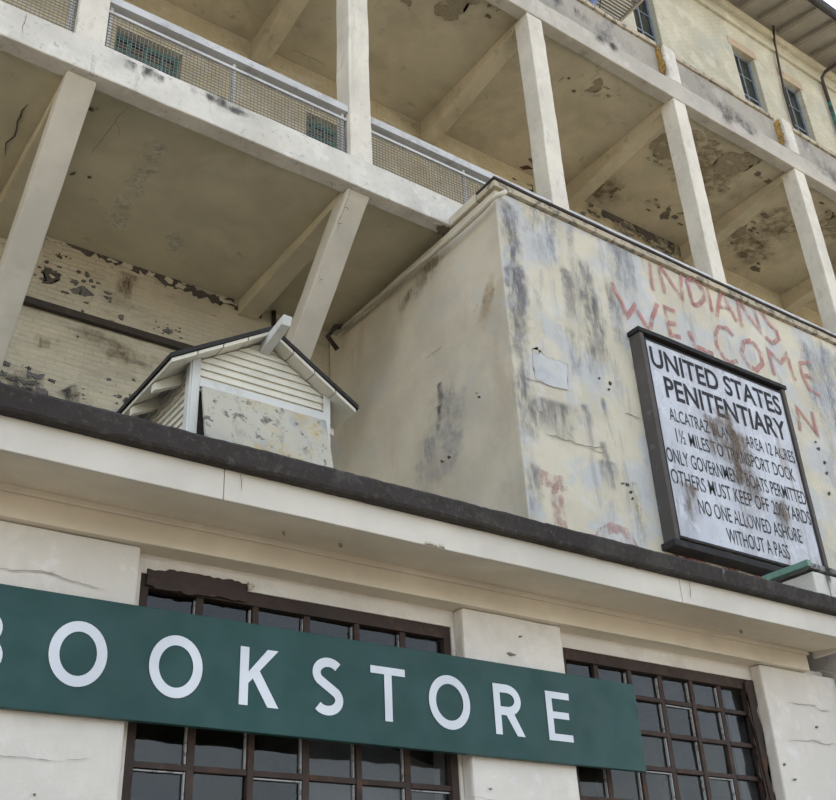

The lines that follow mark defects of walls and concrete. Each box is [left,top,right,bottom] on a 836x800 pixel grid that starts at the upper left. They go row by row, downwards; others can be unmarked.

peeling [434,0,500,21]
peeling [646,133,674,171]
peeling [692,130,772,192]
peeling [730,213,770,245]
peeling [33,236,238,313]
peeling [0,360,56,395]
crack [0,568,106,590]
peeling [146,568,255,602]